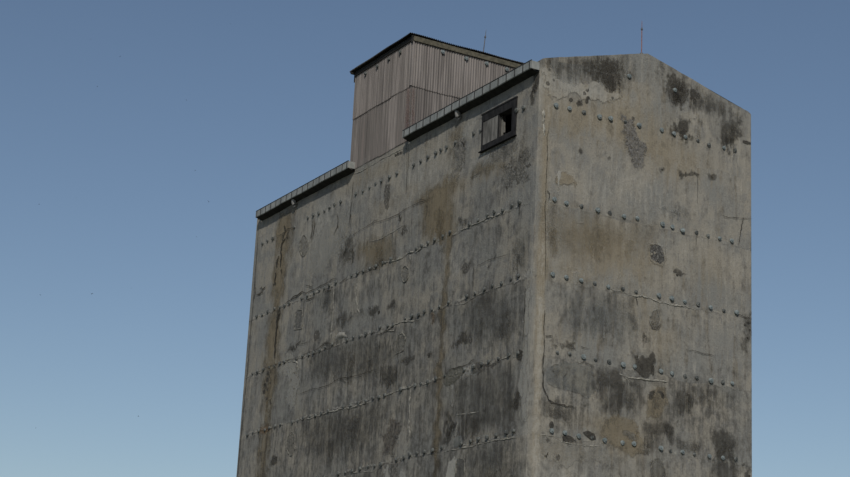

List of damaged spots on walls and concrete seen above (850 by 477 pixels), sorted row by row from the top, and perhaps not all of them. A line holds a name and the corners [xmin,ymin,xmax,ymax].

damp [542,54,628,93]
spalling [621,115,647,168]
damp [662,65,741,146]
crack [335,144,430,236]
spalling [649,243,666,266]
crack [237,221,388,477]
crack [522,287,594,407]
damp [597,352,695,465]